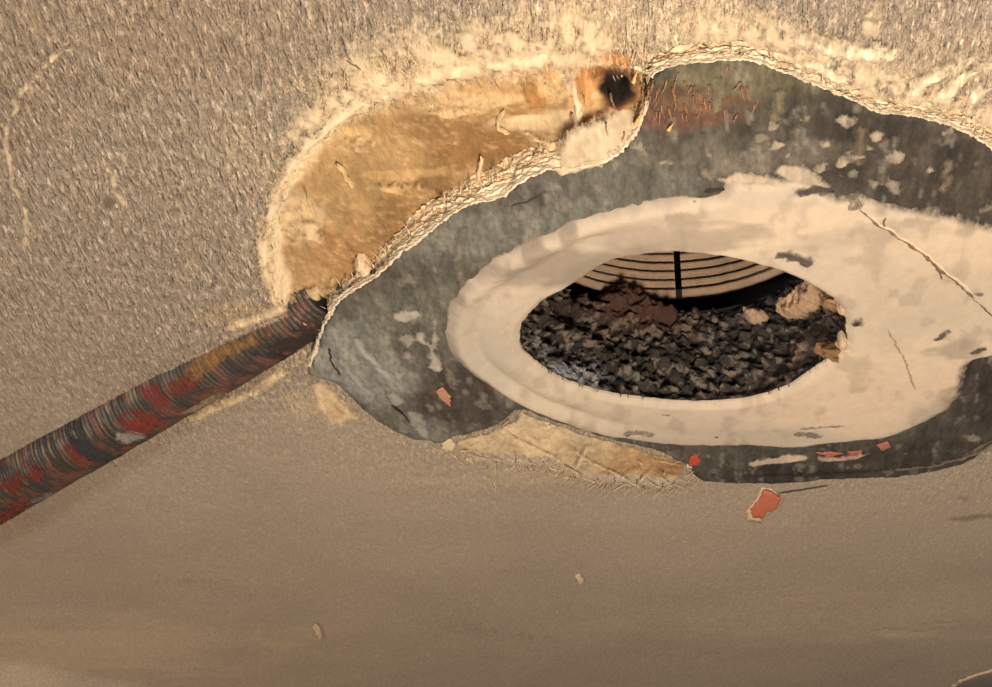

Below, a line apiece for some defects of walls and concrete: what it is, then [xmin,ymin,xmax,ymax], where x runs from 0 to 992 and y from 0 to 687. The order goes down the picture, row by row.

rust [577,53,759,141]
spalling [255,0,992,376]
spalling [311,383,359,426]
spalling [431,411,701,499]